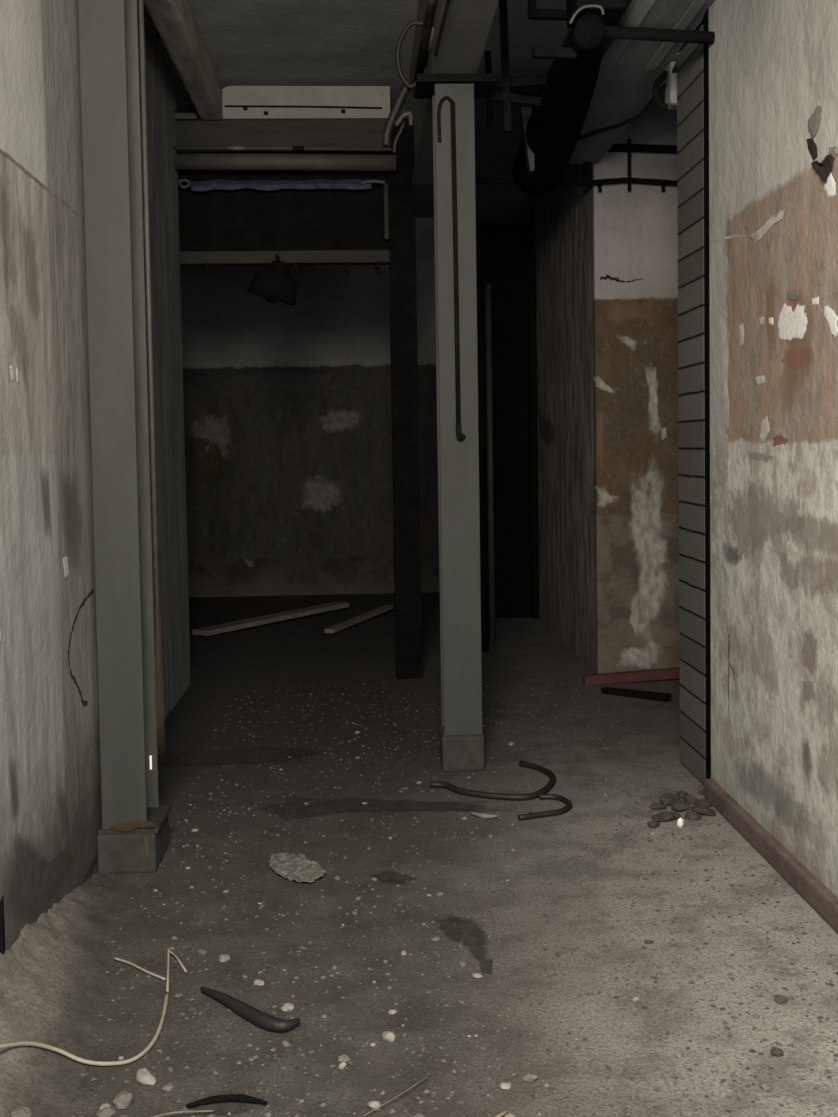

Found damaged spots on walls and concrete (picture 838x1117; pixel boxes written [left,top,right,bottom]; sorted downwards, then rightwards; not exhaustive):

spalling [806,106,838,197]
peeling [752,211,783,241]
peeling [759,291,838,340]
peeling [595,377,614,393]
peeling [618,336,637,350]
peeling [645,368,667,440]
spalling [720,305,744,428]
peeling [599,488,617,506]